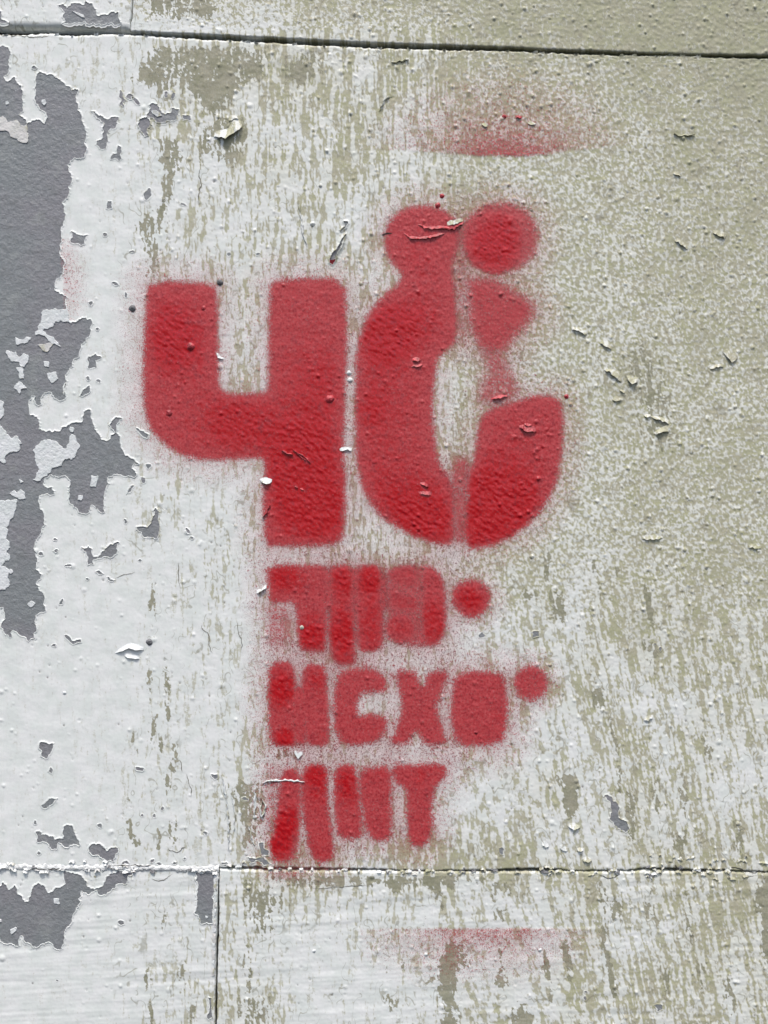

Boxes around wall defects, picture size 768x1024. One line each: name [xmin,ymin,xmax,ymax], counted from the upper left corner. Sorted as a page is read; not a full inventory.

peeling [54,0,124,38]
peeling [0,9,193,643]
peeling [0,795,313,976]
peeling [602,792,632,835]